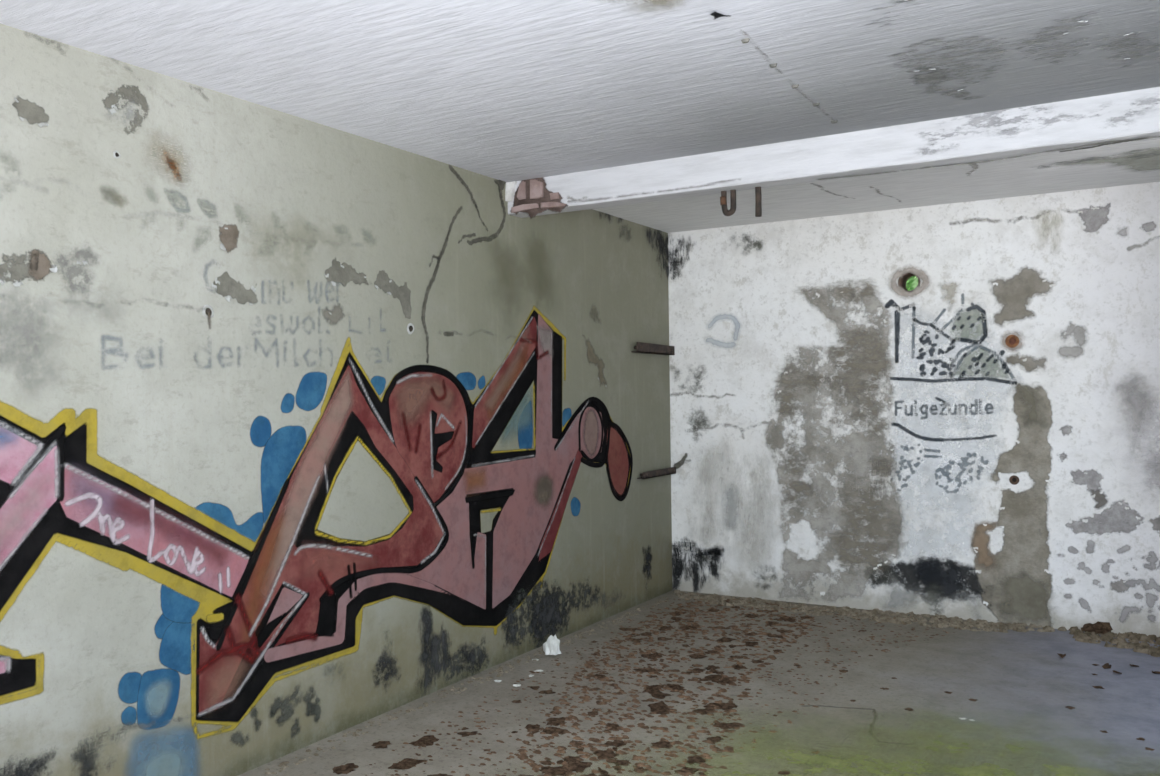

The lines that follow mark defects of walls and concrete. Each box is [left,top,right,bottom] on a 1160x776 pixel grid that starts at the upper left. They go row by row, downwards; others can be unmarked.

rust [160,151,181,179]
spalling [505,177,568,218]
peeling [0,249,97,292]
peeling [323,258,415,335]
crack [422,165,506,363]
peeling [991,267,1056,326]
peeling [1006,354,1046,372]
peeling [766,284,902,601]
peeling [971,384,1160,627]
damp [866,558,991,614]
damp [0,756,53,776]
damp [74,735,103,776]